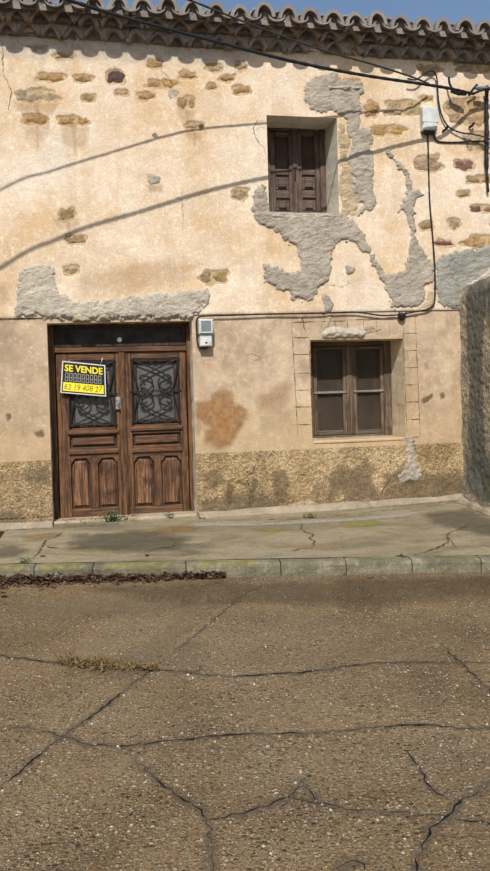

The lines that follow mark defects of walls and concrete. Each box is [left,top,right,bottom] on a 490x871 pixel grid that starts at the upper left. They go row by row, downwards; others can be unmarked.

spalling [62,264,80,276]